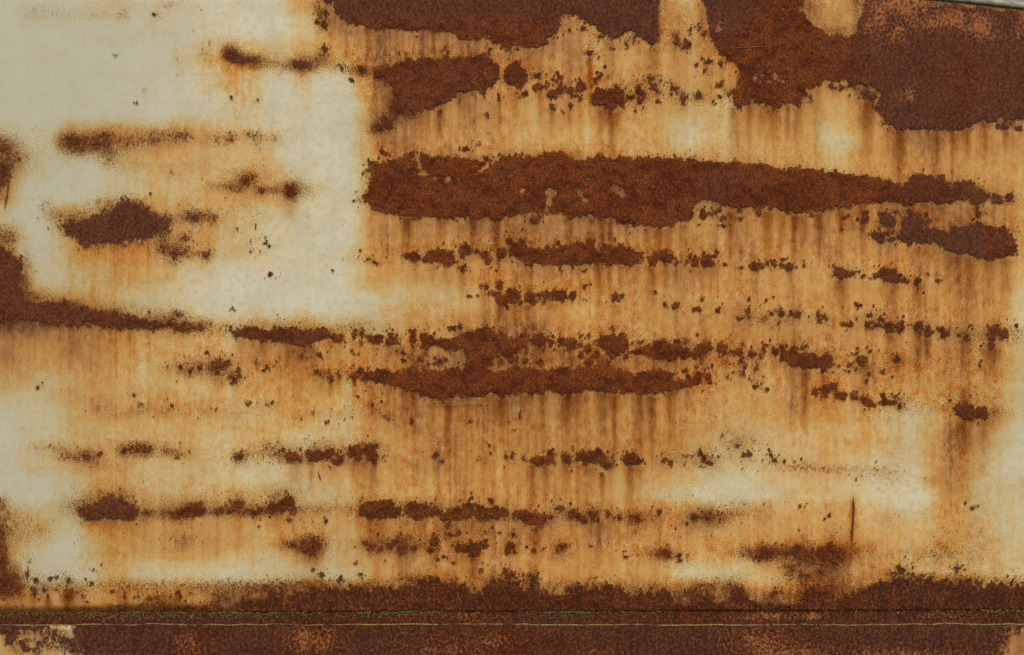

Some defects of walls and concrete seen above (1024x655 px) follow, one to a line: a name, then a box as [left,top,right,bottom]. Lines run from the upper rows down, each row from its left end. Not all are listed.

rust [0,119,320,288]